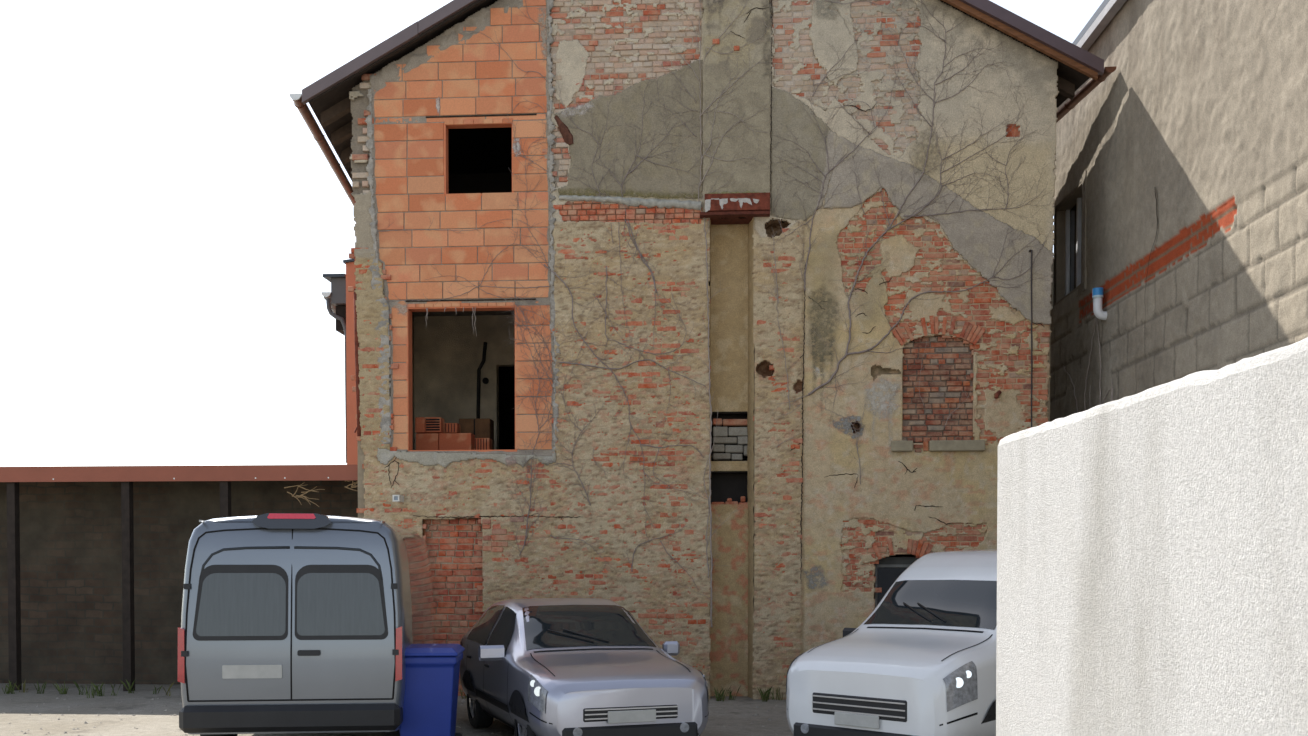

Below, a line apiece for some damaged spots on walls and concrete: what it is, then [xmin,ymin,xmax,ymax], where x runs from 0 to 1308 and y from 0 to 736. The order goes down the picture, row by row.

flaking render [542,0,704,188]
flaking render [769,0,922,159]
flaking render [553,198,759,224]
flaking render [836,189,1052,445]
peeling [376,448,556,468]
flaking render [840,517,988,592]